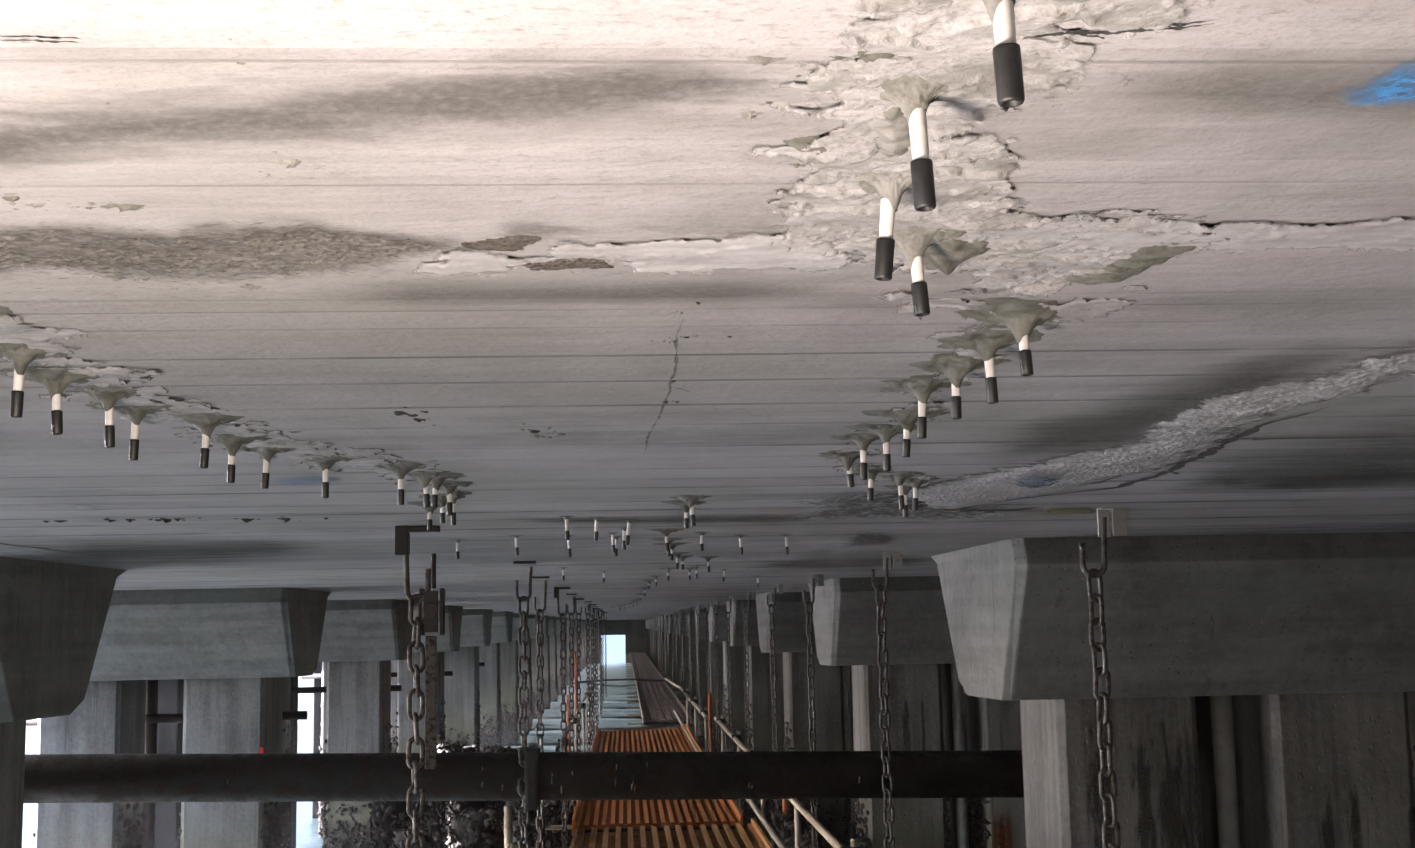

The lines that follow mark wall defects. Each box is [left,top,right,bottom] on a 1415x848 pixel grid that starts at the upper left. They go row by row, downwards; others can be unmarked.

peeling [908,0,953,15]
peeling [746,51,911,88]
water stain [0,74,737,156]
peeling [735,101,790,121]
peeling [868,107,911,157]
peeling [783,134,827,168]
peeling [0,187,50,211]
peeling [66,202,145,213]
spalling [0,228,855,290]
peeling [923,239,991,275]
peeling [1064,242,1197,285]
spalling [394,407,435,426]